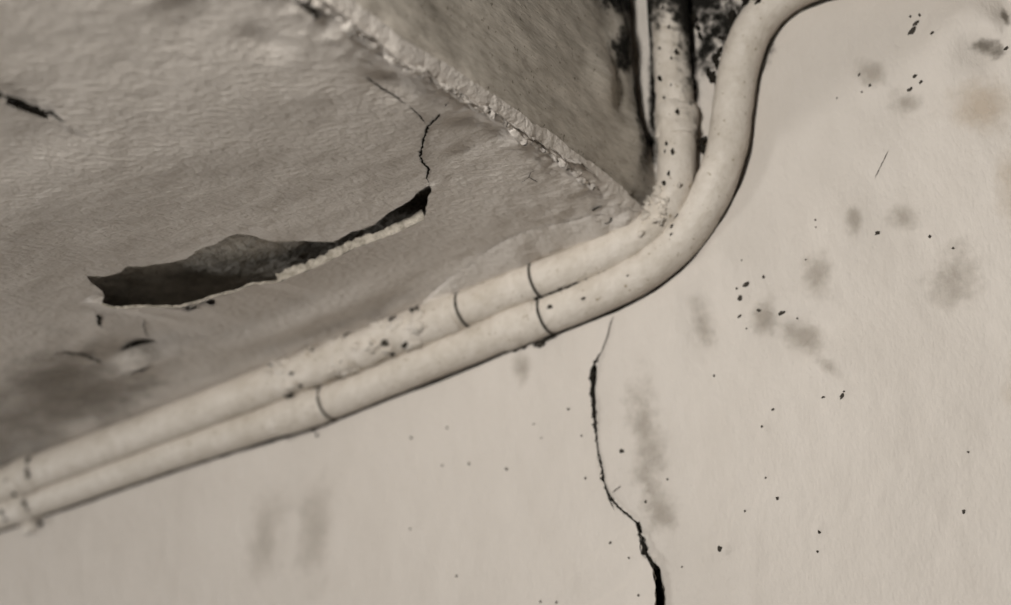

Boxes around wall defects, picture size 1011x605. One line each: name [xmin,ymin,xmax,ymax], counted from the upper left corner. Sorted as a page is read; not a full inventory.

peeling [0,92,65,122]
crack [409,102,449,182]
spalling [295,0,600,190]
water stain [601,0,761,164]
flaking render [87,186,431,309]
peeling [327,185,678,378]
crack [588,318,666,605]